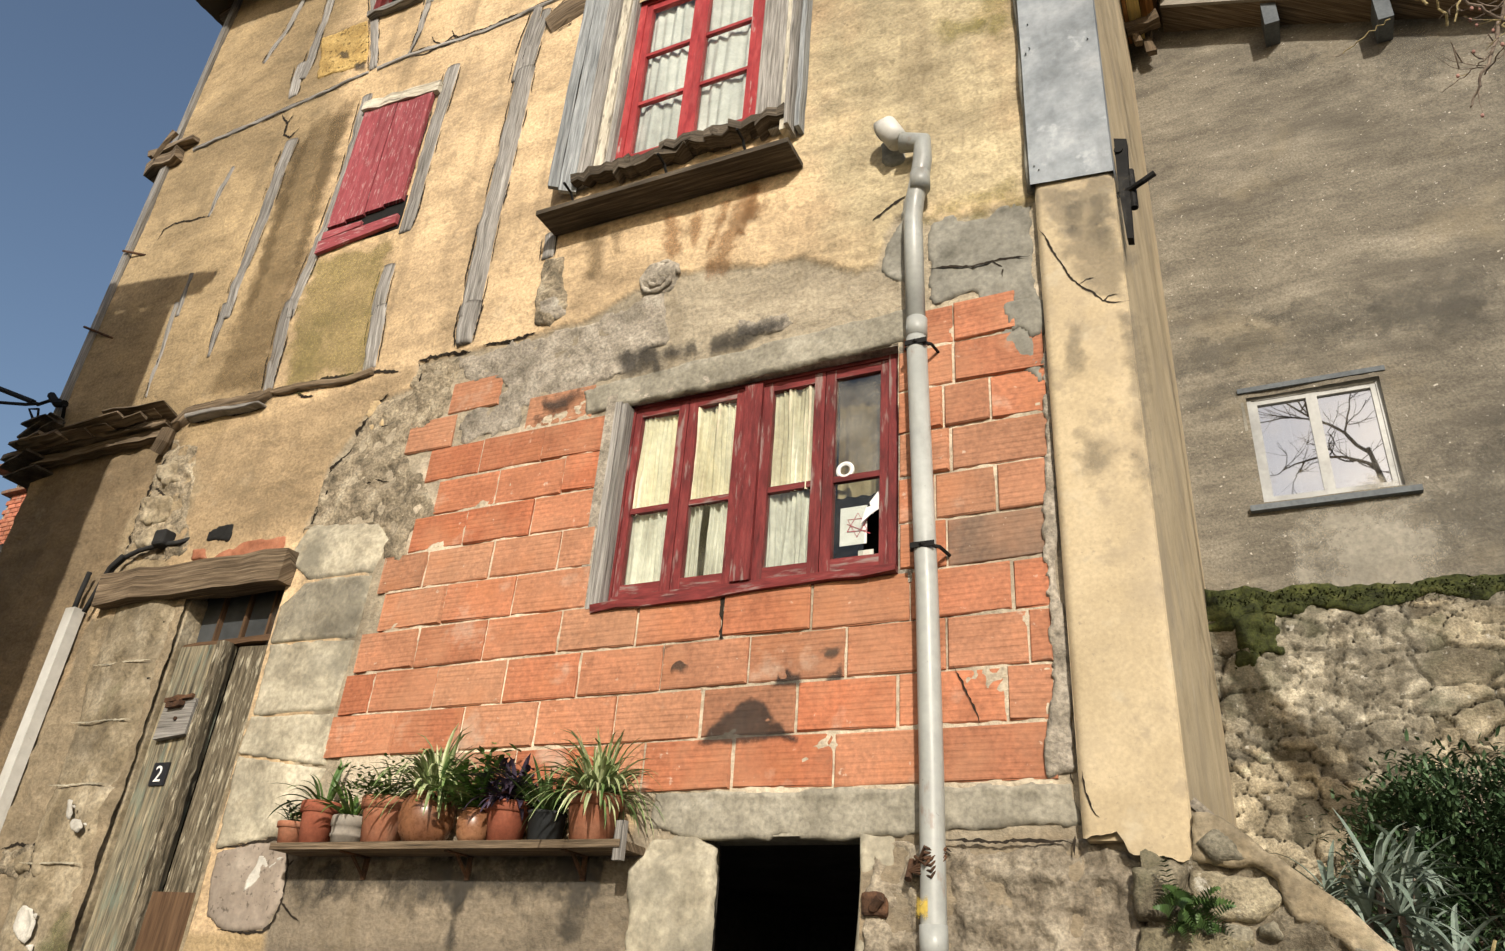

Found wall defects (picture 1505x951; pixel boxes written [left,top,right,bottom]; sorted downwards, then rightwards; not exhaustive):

crack [929,227,1129,303]
spalling [737,313,793,336]
spalling [304,293,670,560]
spalling [124,439,286,561]
water stain [702,699,795,744]
crack [955,669,980,723]